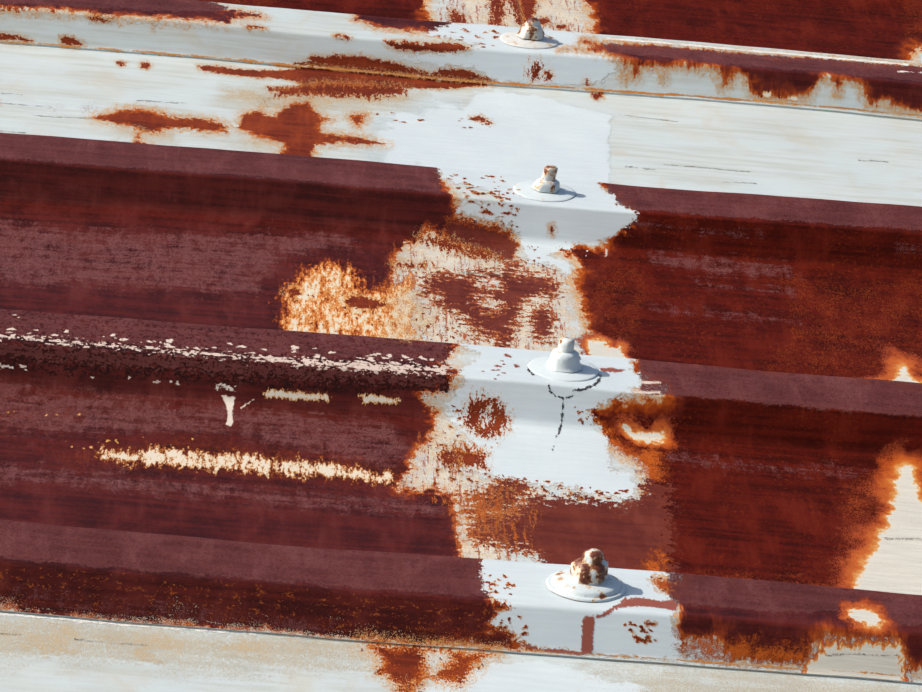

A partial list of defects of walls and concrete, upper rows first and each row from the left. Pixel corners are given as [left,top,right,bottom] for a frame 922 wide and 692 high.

corrosion [0,29,128,53]
corrosion [133,50,218,59]
corrosion [522,54,550,84]
peeling [0,314,450,379]
peeling [262,388,332,404]
peeling [358,393,402,406]
corrosion [458,387,515,445]
peeling [47,428,418,493]
corrosion [594,597,678,618]
corrosion [674,658,740,668]